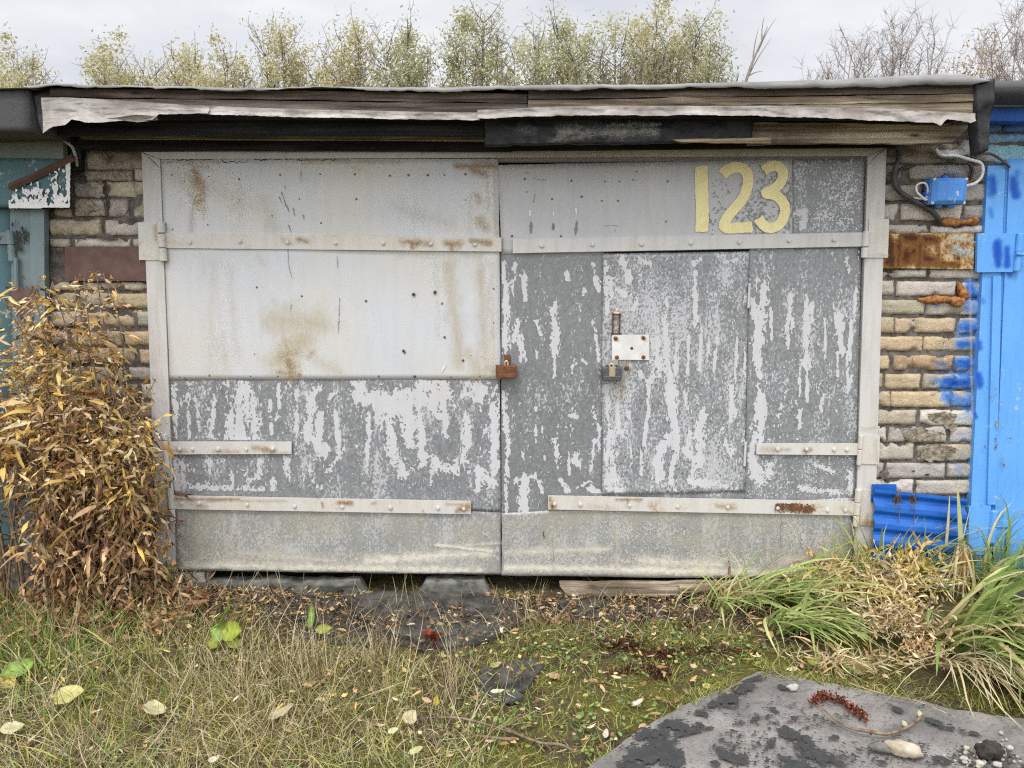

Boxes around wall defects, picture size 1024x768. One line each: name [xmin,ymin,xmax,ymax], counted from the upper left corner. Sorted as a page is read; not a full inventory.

peeling [9,162,128,215]
corrosion [884,234,961,268]
peeling [171,248,860,575]